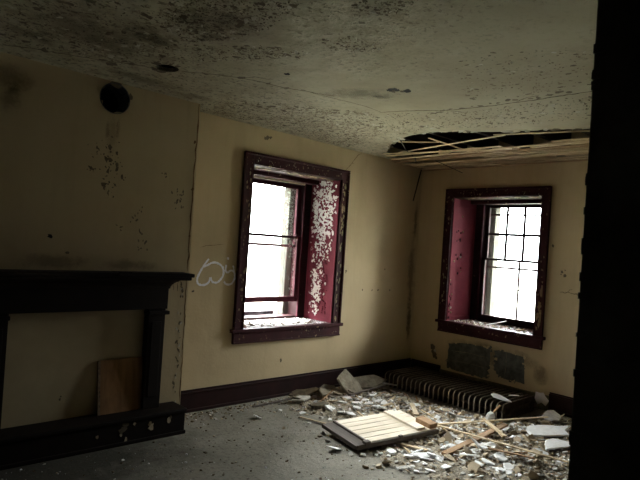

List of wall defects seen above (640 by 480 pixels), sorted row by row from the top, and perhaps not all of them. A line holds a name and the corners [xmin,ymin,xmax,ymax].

peeling [244,160,347,331]
peeling [445,342,526,384]